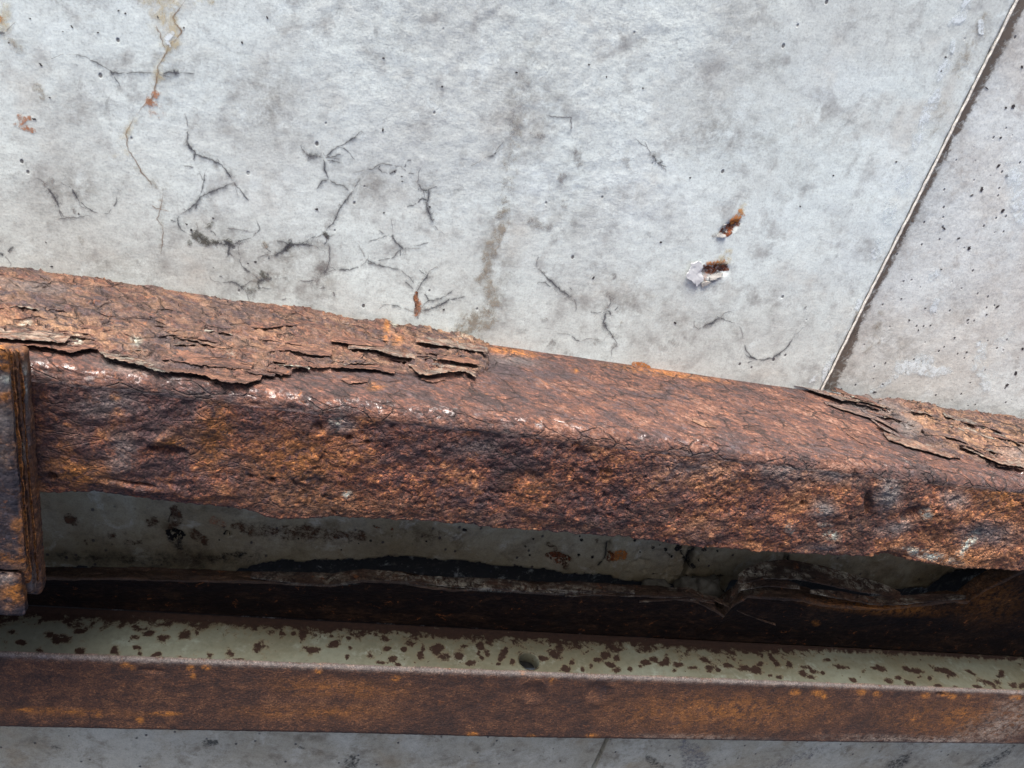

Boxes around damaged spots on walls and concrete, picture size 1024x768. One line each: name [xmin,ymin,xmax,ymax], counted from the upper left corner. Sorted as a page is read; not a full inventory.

crack [79,5,193,178]
crack [40,179,117,219]
crack [154,124,465,317]
spalling [712,209,743,238]
spalling [686,260,729,288]
rust [146,505,209,545]
rust [209,516,393,541]
rust [545,542,571,569]